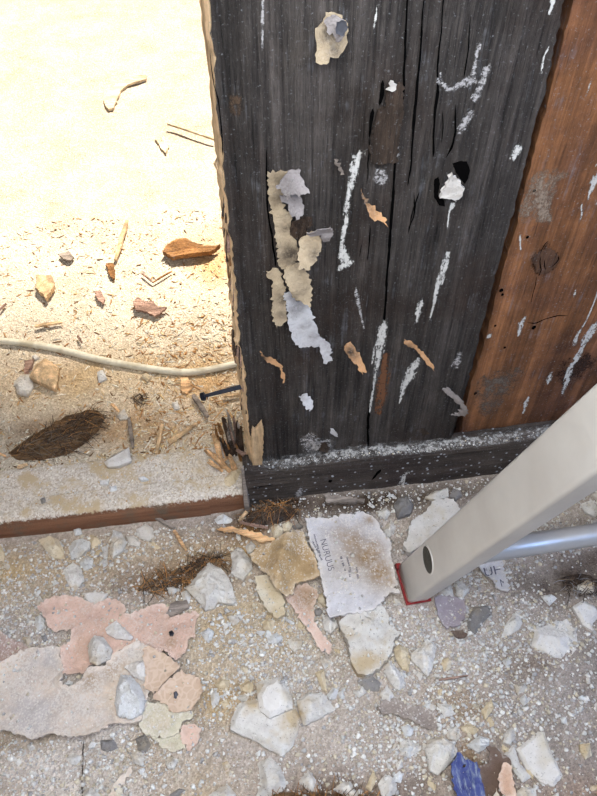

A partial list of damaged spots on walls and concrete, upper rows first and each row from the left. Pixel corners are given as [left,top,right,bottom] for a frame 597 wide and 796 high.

peeling [315,12,348,65]
crack [463,15,471,76]
crack [360,0,457,448]